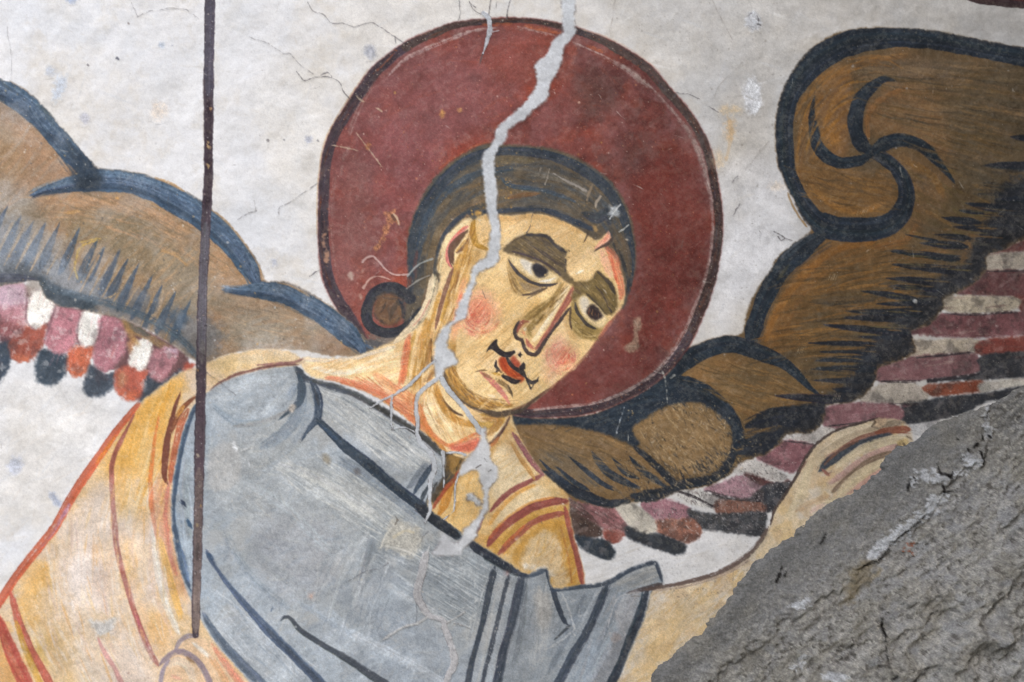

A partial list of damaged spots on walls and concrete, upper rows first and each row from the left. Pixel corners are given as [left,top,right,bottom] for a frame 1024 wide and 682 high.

crack [368,0,578,682]